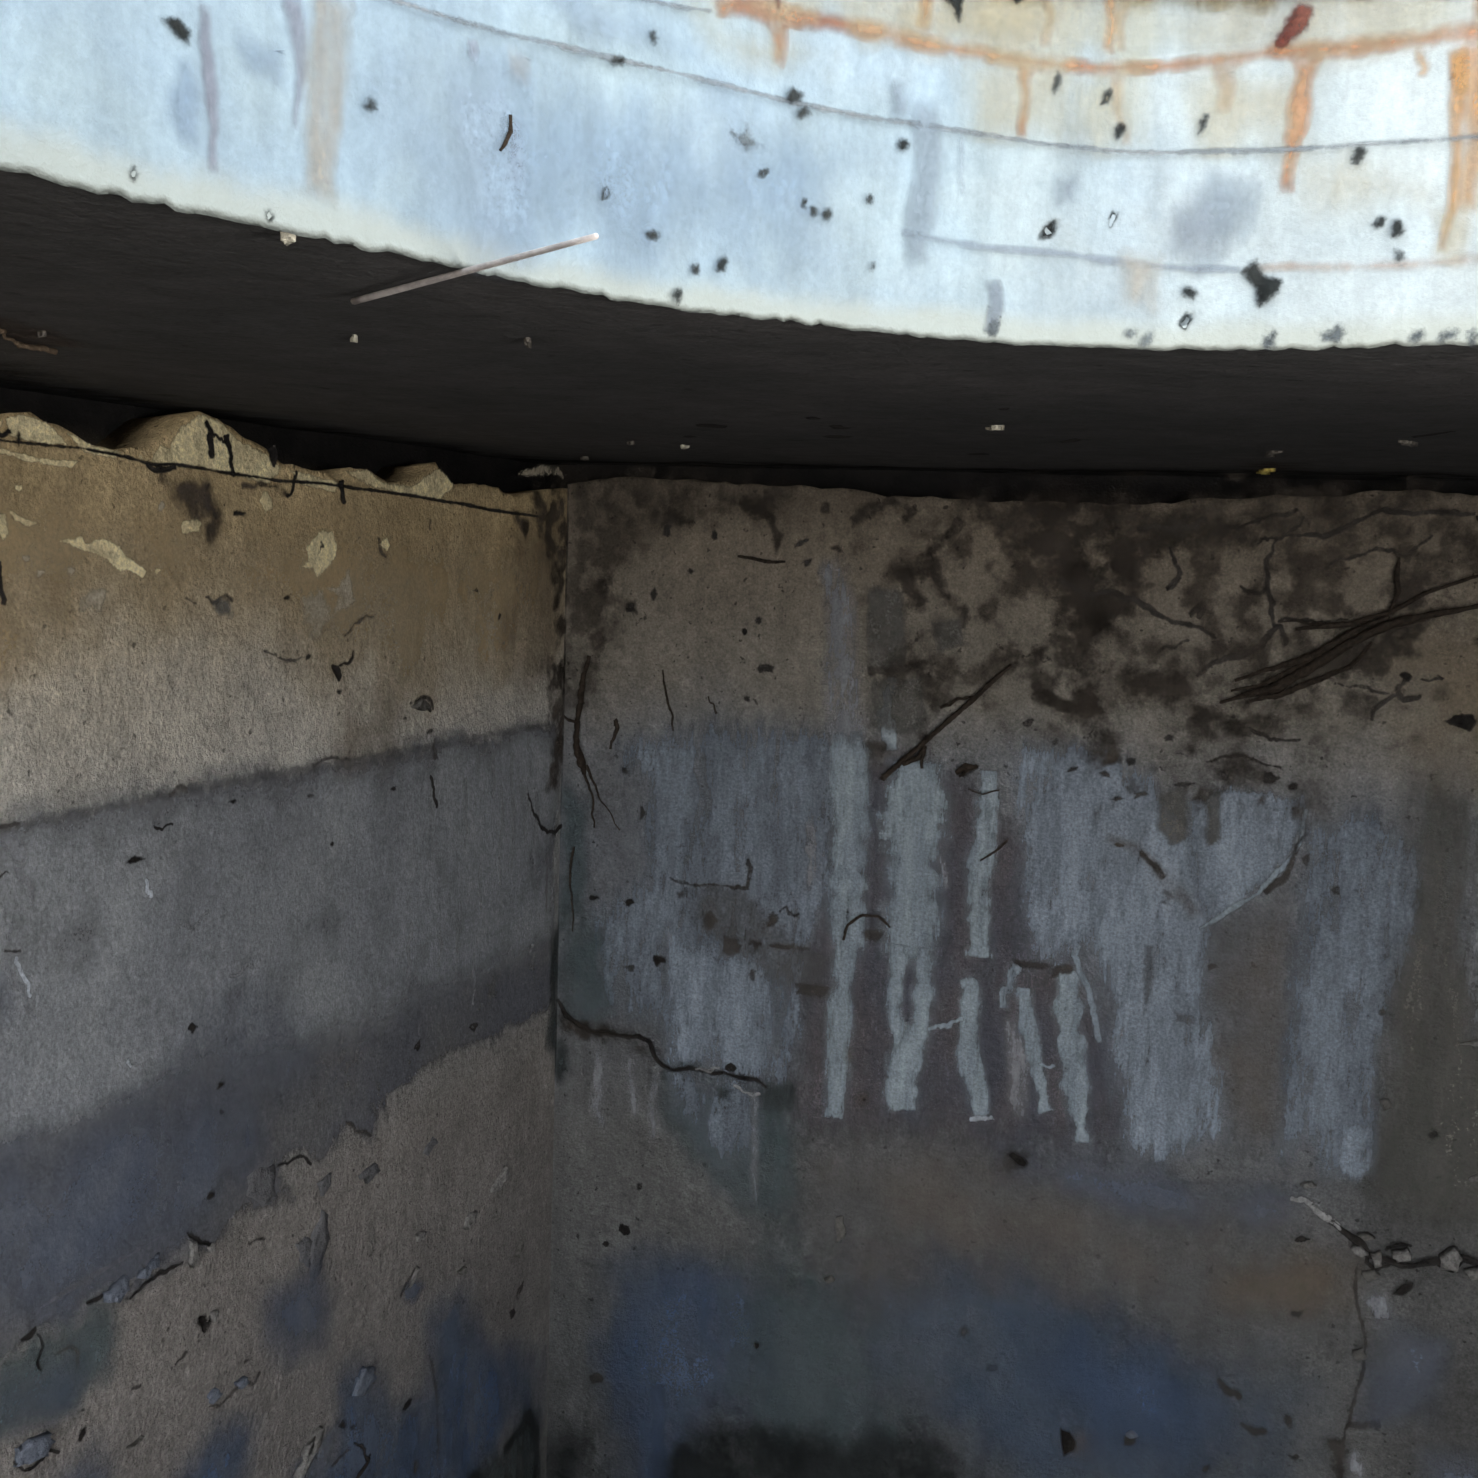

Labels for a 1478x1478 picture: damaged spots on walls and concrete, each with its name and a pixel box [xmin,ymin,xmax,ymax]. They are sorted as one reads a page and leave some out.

rust [719,0,1241,133]
rust [1195,0,1276,8]
rust [1264,25,1478,237]
flaking render [0,415,119,468]
flaking render [140,415,453,513]
crack [1056,507,1476,677]
water stain [1316,482,1478,724]
water stain [628,486,1362,1225]
peeling [0,695,558,1358]
crack [557,999,767,1097]
water stain [1339,783,1478,1218]
crack [1290,1196,1478,1478]